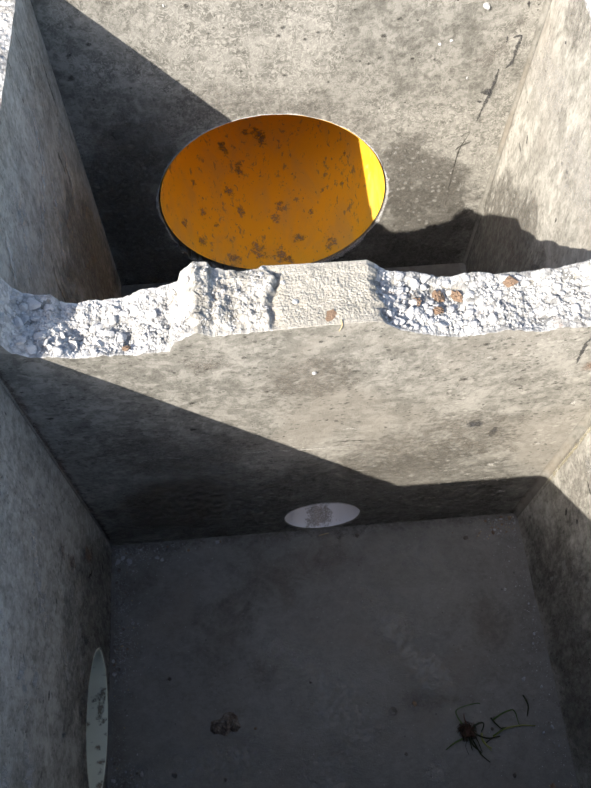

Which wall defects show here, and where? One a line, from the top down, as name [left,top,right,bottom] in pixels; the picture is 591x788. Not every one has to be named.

crack [445,132,471,205]
spalling [0,113,389,359]
spalling [373,259,591,346]